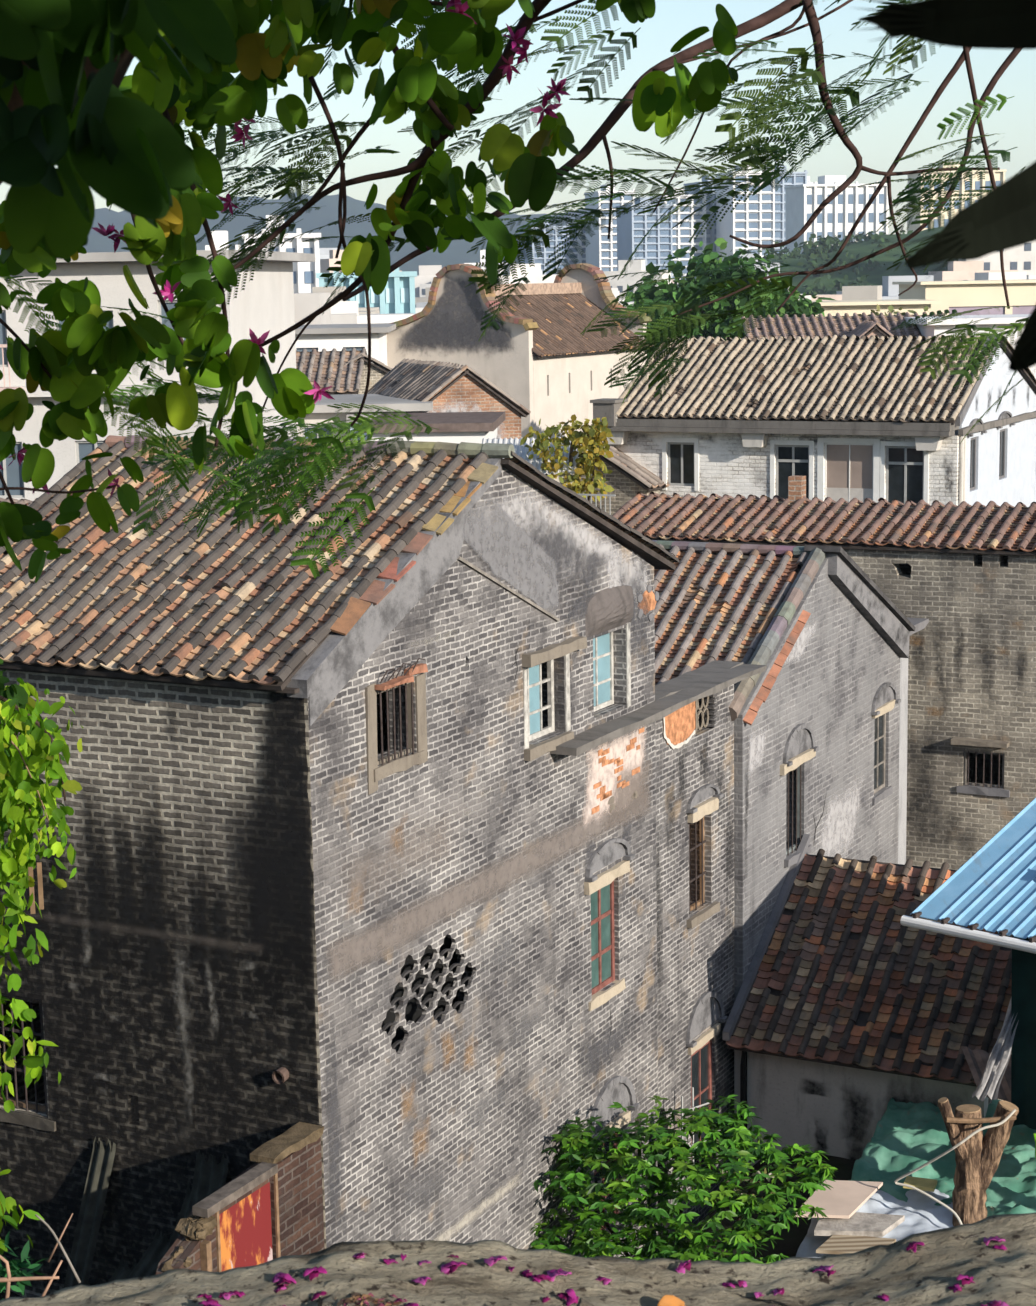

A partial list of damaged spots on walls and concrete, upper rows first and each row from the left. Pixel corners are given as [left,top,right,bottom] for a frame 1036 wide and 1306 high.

spalling [663,700,697,749]
flaking render [585,727,644,824]
damp [0,692,649,1292]